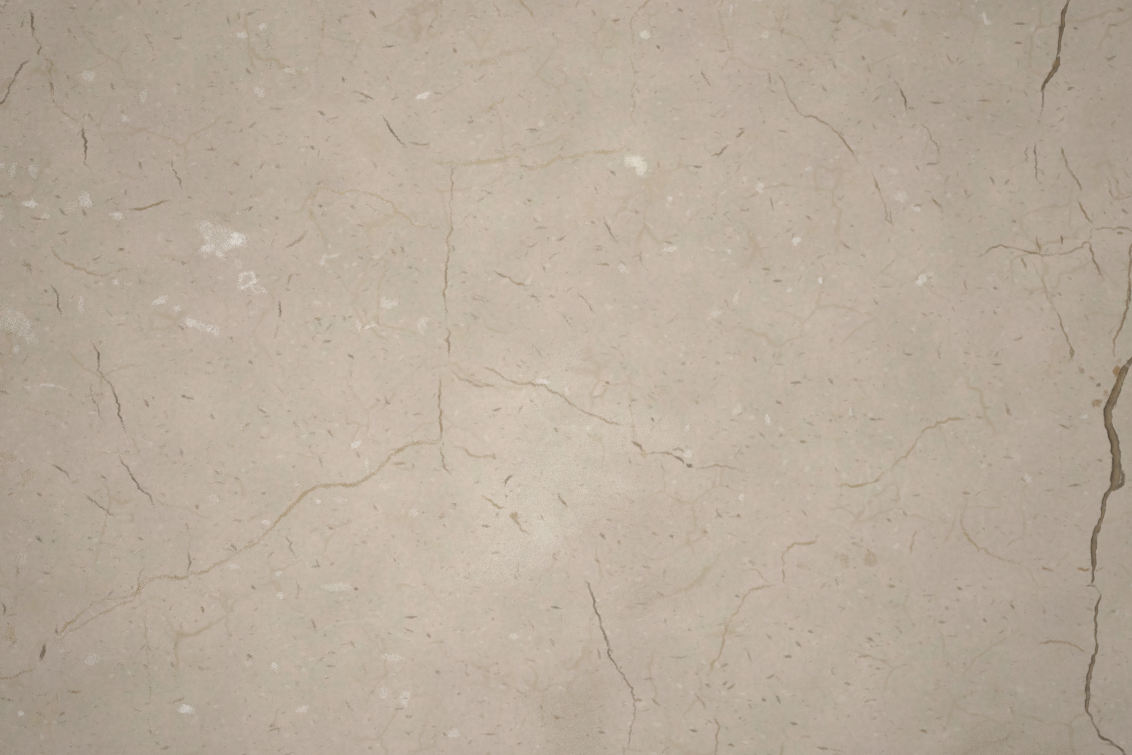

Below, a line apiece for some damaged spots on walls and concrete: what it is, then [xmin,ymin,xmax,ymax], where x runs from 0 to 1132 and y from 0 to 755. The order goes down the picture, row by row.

crack [1040,0,1070,112]
crack [980,144,1132,755]
crack [584,580,636,742]